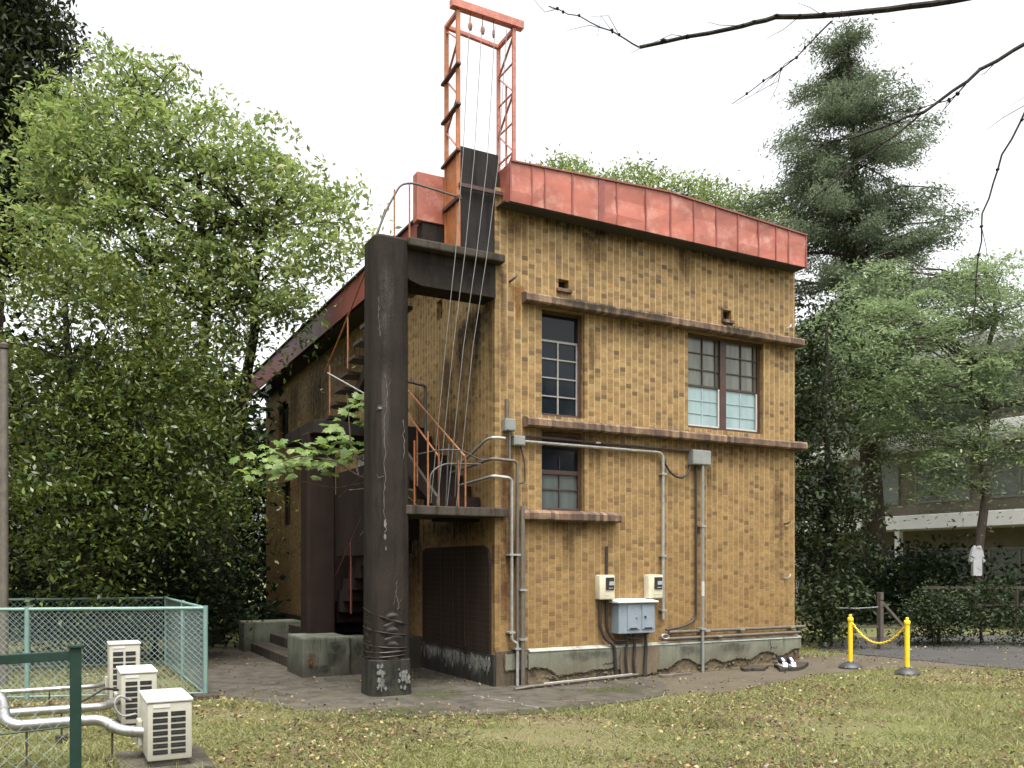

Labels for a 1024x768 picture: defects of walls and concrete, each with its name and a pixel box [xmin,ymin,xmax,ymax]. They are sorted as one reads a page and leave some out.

crack [377,378,405,531]
efflorescence [427,645,482,670]
peeling [421,646,800,685]